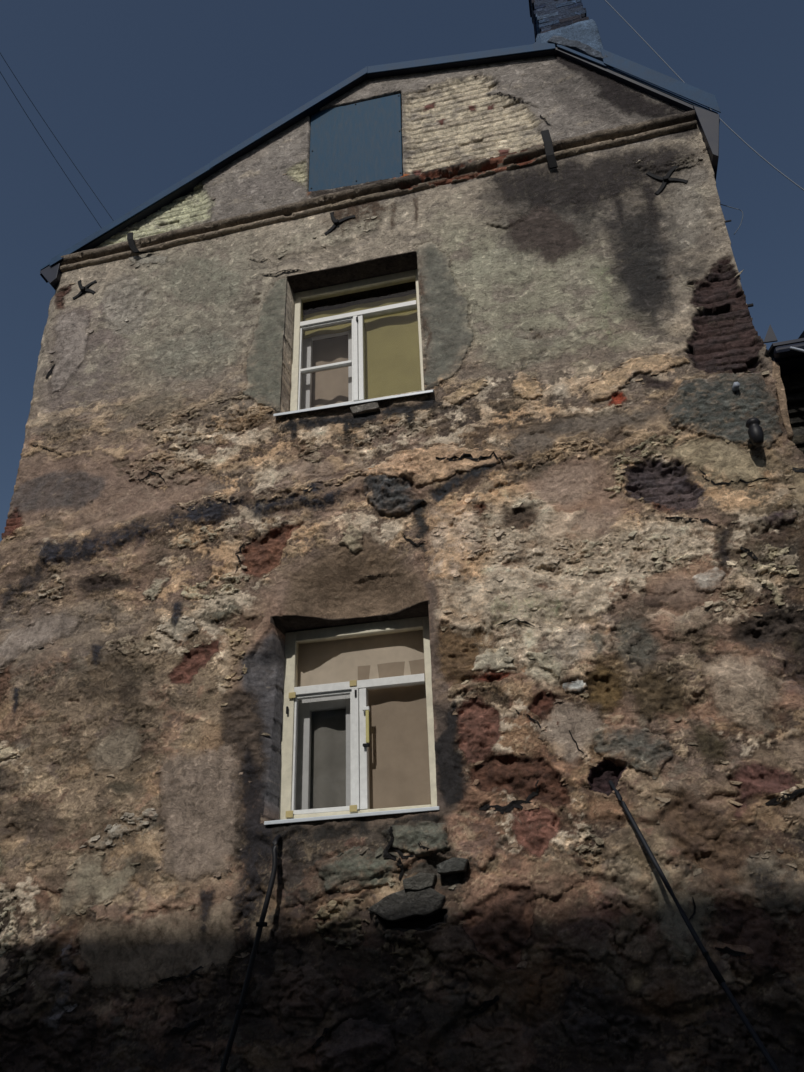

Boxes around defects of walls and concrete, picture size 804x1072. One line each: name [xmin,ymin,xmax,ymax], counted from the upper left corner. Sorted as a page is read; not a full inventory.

spalling [401,74,544,175]
spalling [94,183,216,249]
damp [493,145,688,263]
spalling [584,257,769,406]
peeling [125,391,275,489]
peeling [173,415,603,510]
peeling [600,430,769,512]
spalling [180,523,303,600]
peeling [431,498,804,865]
peeling [55,615,271,993]
spalling [652,726,804,890]
spalling [312,883,535,971]